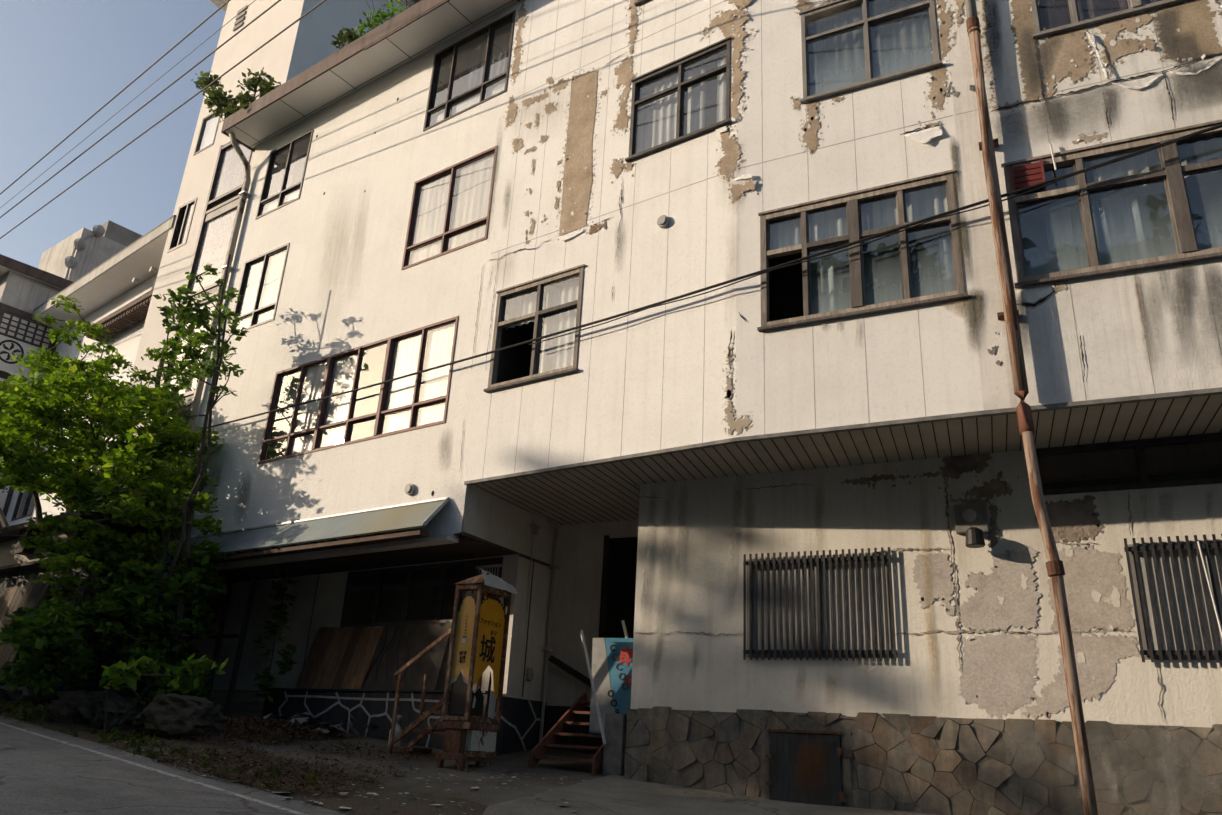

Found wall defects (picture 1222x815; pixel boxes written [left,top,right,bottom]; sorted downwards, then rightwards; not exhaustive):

peeling [794,0,835,18]
peeling [499,0,642,245]
peeling [699,0,756,204]
peeling [790,94,845,154]
peeling [918,0,1222,128]
peeling [1072,132,1108,144]
water stain [1135,267,1222,337]
peeling [722,342,754,437]
crack [636,629,739,637]
peeling [841,453,1141,719]
crack [872,466,1134,671]
crack [1156,664,1164,721]